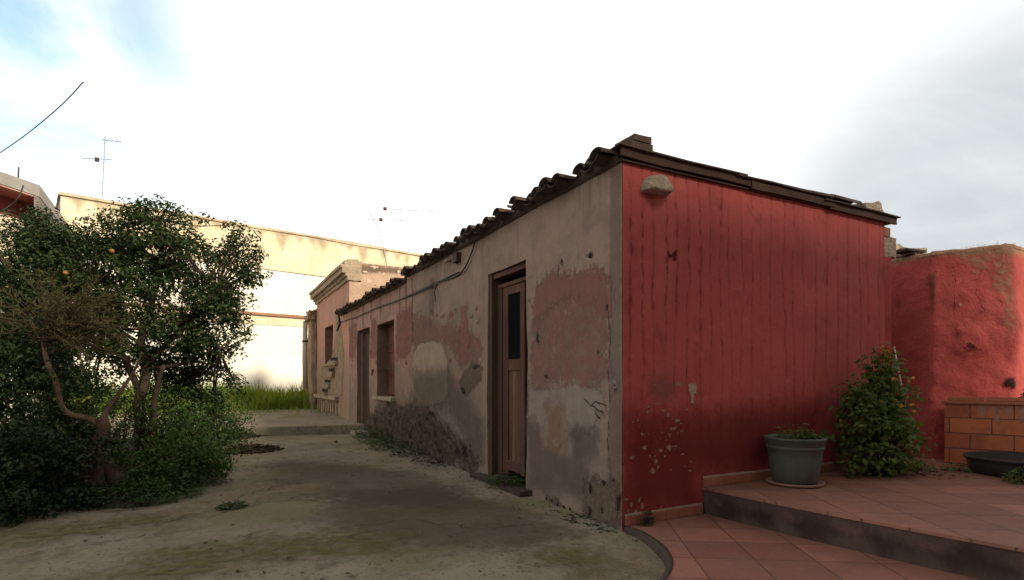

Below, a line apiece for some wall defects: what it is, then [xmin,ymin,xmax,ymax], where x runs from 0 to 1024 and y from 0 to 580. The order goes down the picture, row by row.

peeling [413,301,484,397]
crack [585,393,611,443]